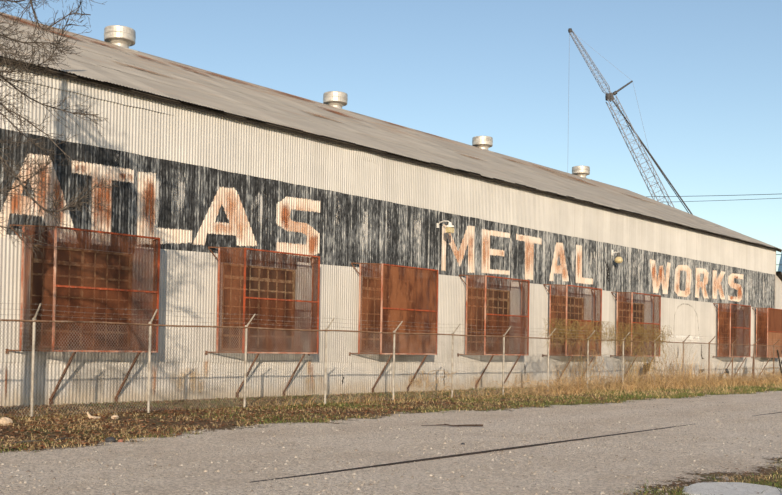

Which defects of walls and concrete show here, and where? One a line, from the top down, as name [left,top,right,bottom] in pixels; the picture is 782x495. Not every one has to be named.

corrosion [11,185,26,214]
corrosion [92,184,112,226]
corrosion [145,184,154,229]
peeling [171,173,185,211]
corrosion [282,206,318,255]